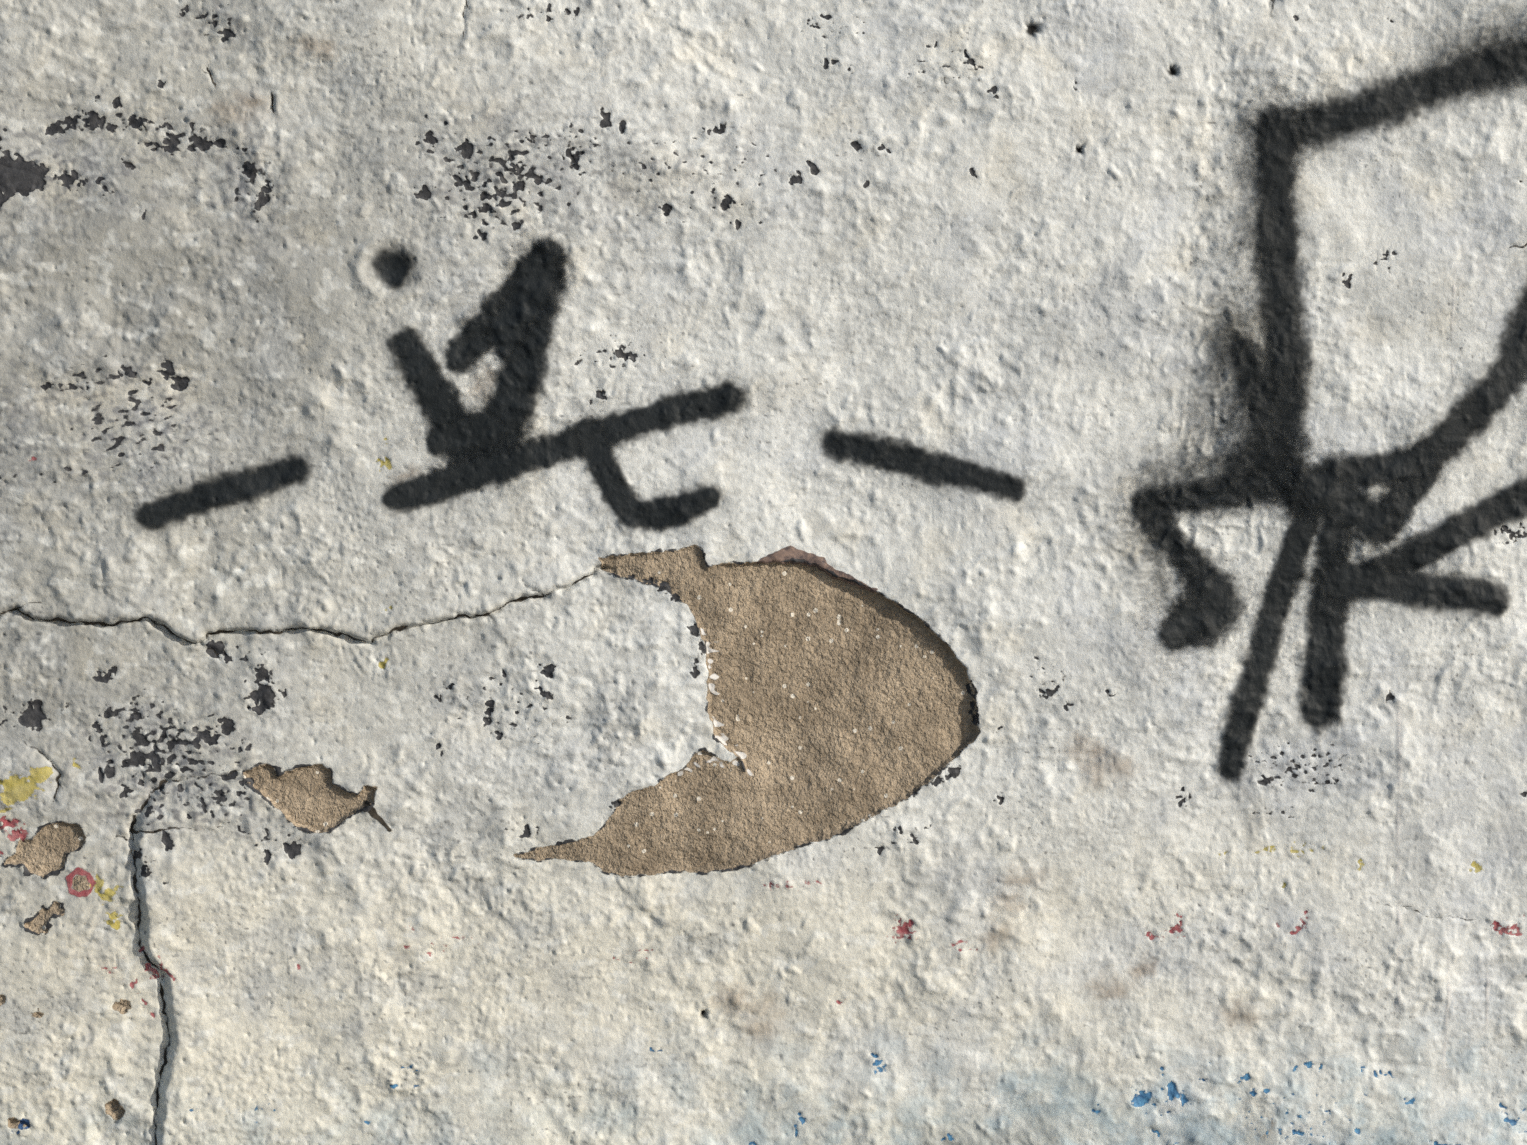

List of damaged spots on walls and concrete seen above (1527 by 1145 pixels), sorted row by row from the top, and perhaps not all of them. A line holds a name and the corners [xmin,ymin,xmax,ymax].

peeling [180,4,236,42]
peeling [519,3,580,22]
crack [1,568,595,655]
peeling [0,695,69,731]
peeling [93,666,117,683]
peeling [206,639,287,715]
peeling [434,664,572,740]
spalling [505,544,1003,878]
peeling [1031,656,1074,711]
spalling [73,689,392,885]
spalling [0,766,123,935]
crack [116,771,235,1145]